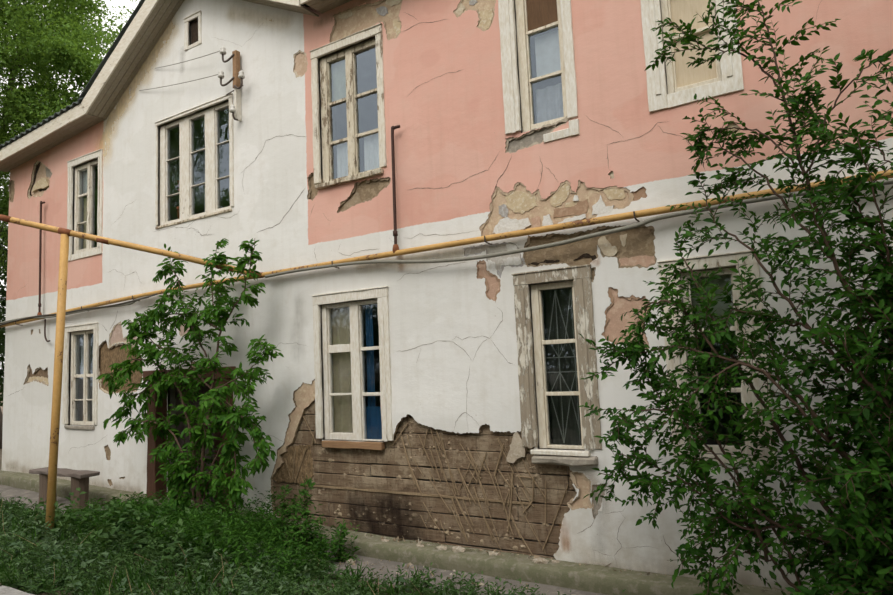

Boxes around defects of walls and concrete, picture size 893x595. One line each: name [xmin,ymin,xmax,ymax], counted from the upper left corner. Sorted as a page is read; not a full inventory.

peeling [330,0,402,43]
peeling [453,0,496,31]
flaking render [506,116,569,153]
flaking render [28,161,52,199]
flaking render [338,177,391,213]
crack [411,155,512,204]
peeling [464,171,657,302]
peeling [602,287,650,349]
flaking render [25,366,49,386]
flaking render [99,322,143,394]
crack [405,307,514,428]
flaking render [272,380,608,559]